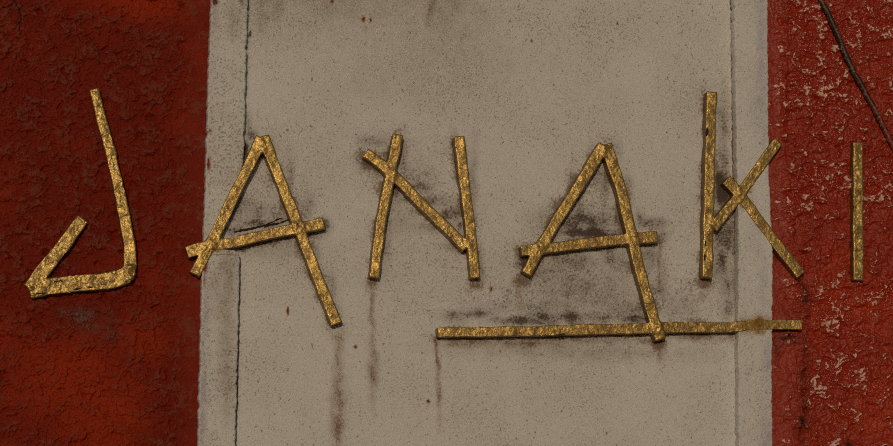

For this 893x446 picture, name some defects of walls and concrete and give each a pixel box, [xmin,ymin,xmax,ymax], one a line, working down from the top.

corrosion [334,336,343,440]